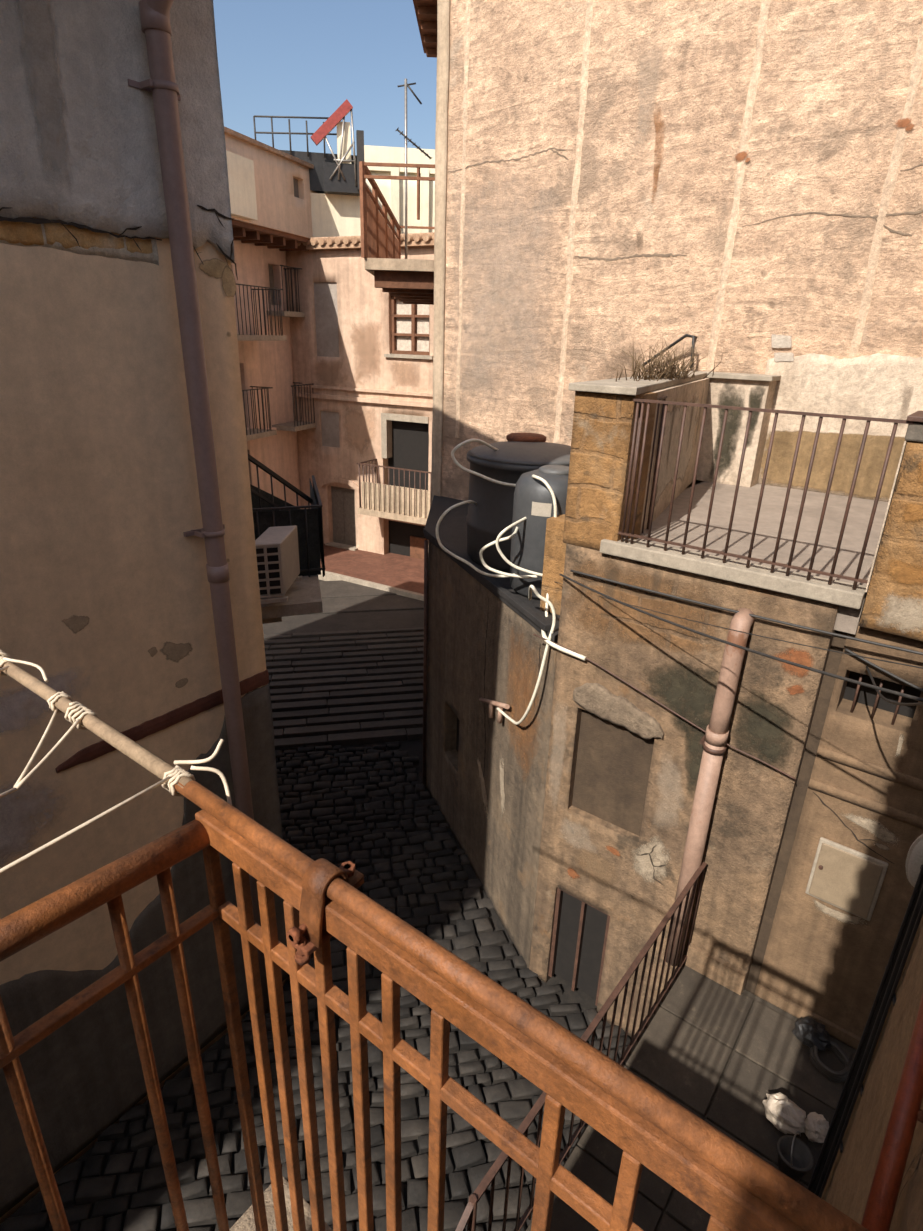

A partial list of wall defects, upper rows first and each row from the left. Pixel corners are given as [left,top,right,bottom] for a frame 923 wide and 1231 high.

crack [447,148,570,173]
spalling [0,217,159,266]
crack [575,253,686,261]
crack [743,210,923,236]
leakage [710,385,905,499]
peeling [148,642,192,662]
leakage [649,665,717,792]
leakage [736,695,791,765]